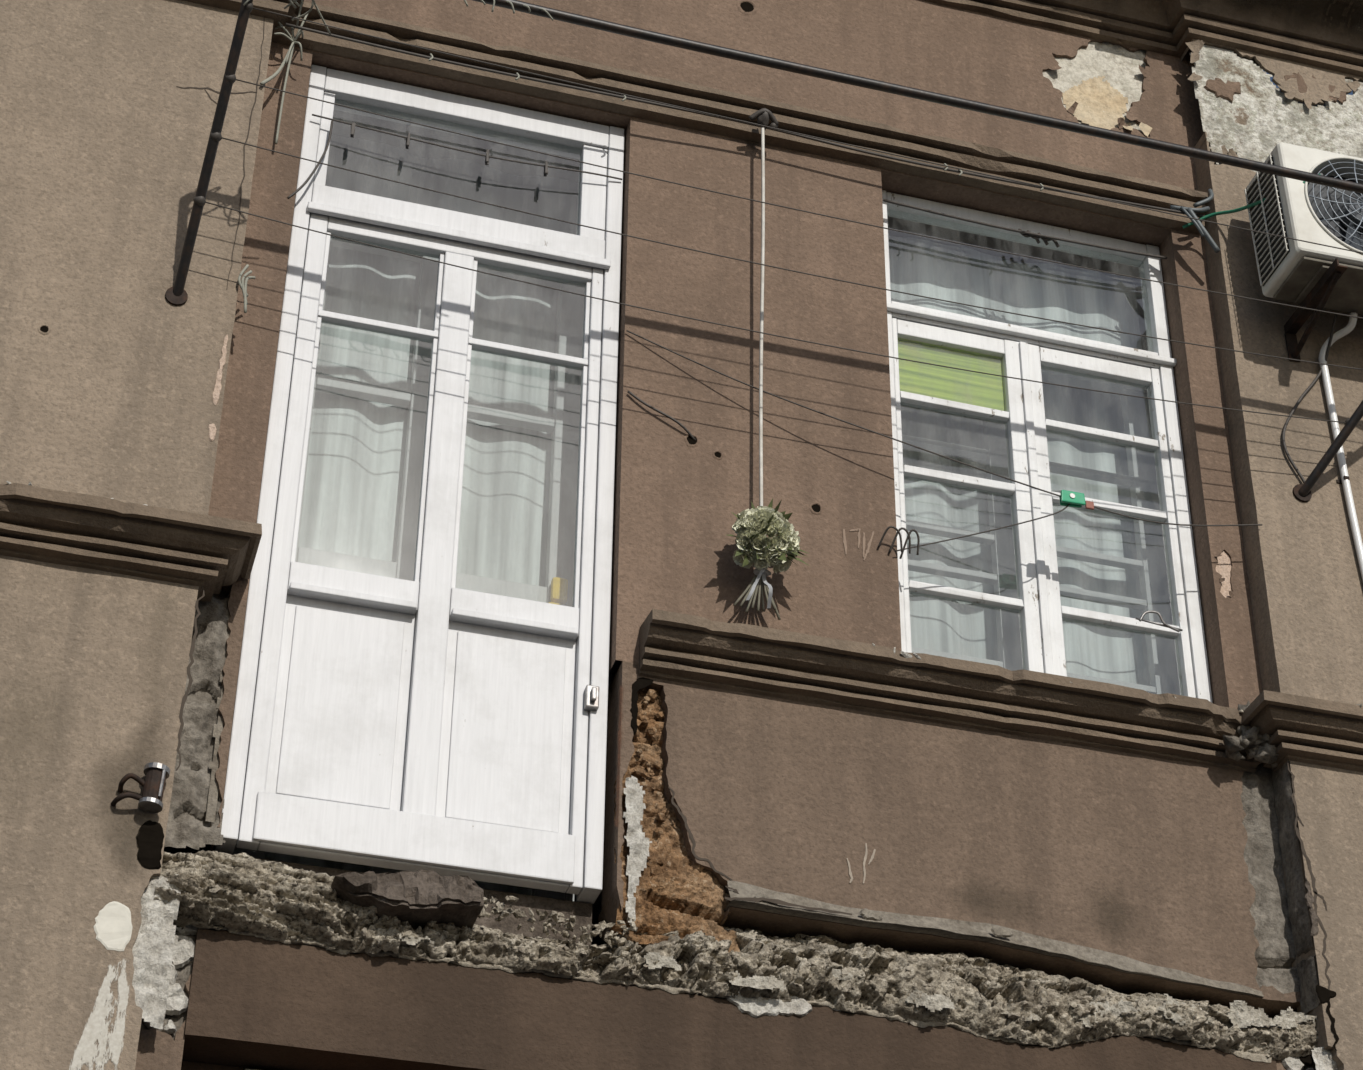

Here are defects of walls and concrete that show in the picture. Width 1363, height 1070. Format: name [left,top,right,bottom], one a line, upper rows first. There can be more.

peeling [1043,40,1152,137]
peeling [1186,40,1363,173]
peeling [1215,551,1234,598]
spalling [94,590,1339,1070]
crack [1287,759,1331,990]
efflorescence [69,959,129,1070]